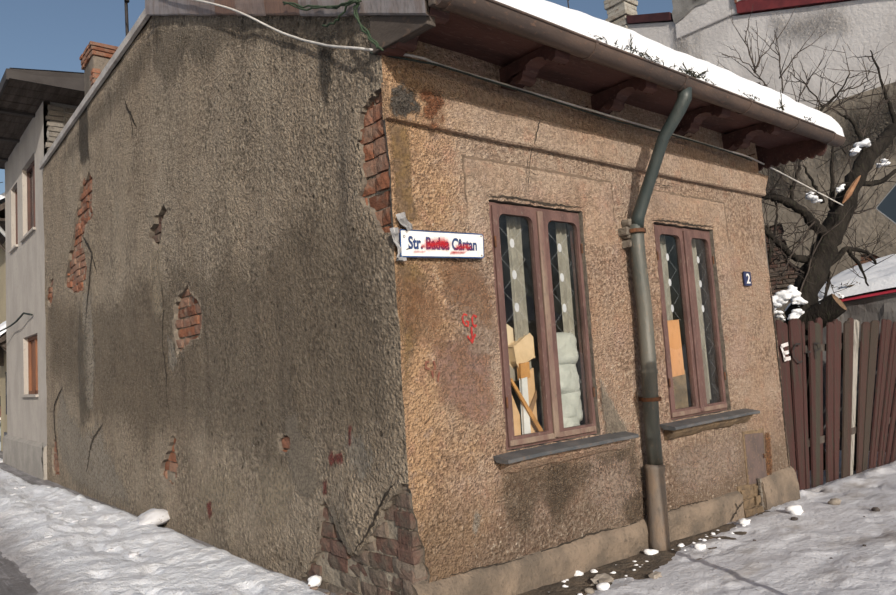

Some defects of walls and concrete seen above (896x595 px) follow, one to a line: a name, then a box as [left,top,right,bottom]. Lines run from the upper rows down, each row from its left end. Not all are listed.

spalling [357,88,417,233]
crack [486,122,580,208]
spalling [64,167,93,294]
spalling [148,204,167,251]
spalling [173,284,202,356]
crack [41,387,63,471]
crack [86,424,103,471]
spalling [160,435,178,489]
spalling [302,483,430,595]